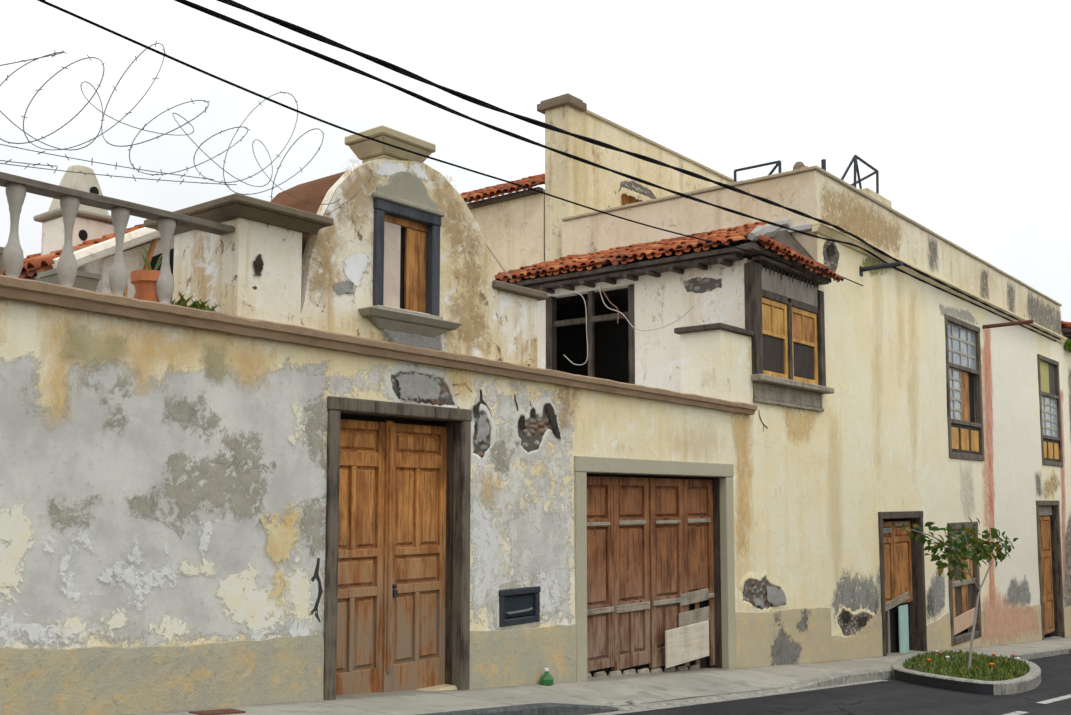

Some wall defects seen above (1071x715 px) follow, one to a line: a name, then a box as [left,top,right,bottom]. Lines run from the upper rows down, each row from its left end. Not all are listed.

water stain [928,235,938,270]
spalling [247,254,264,290]
spalling [681,274,726,298]
water stain [980,270,988,299]
water stain [940,305,977,324]
water stain [1007,284,1061,335]
water stain [49,495,102,530]
water stain [128,396,328,619]
peeling [0,351,458,649]
peeling [470,377,575,630]
spalling [739,568,810,666]
spalling [834,604,878,638]